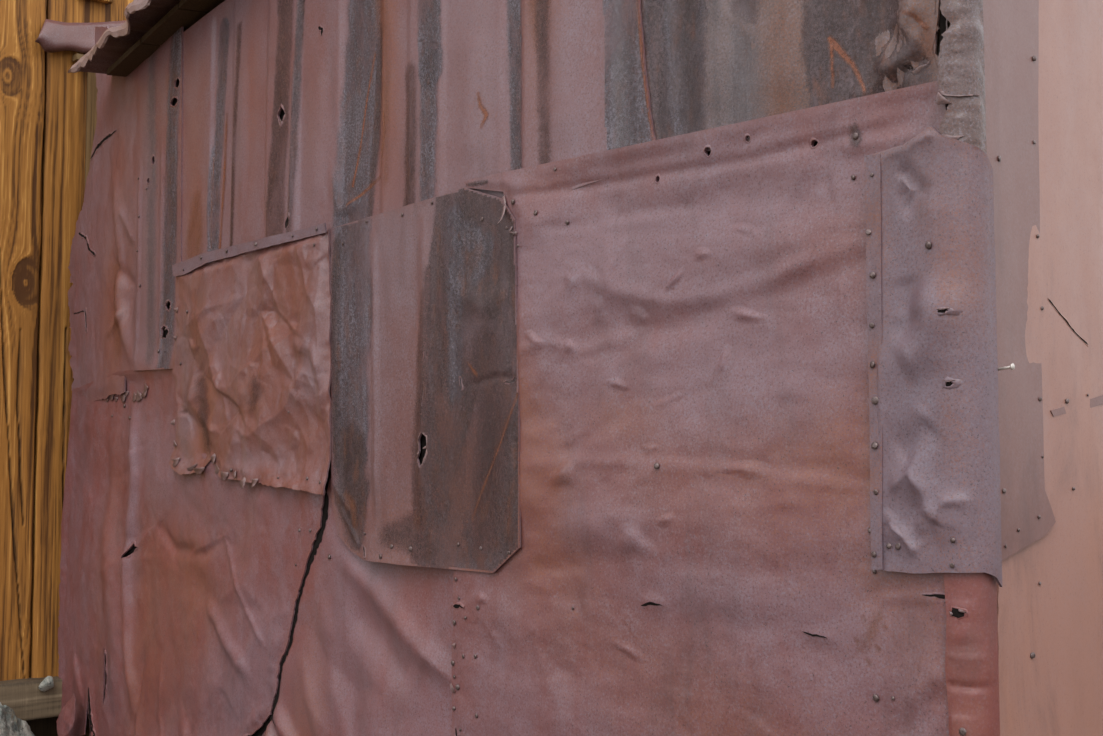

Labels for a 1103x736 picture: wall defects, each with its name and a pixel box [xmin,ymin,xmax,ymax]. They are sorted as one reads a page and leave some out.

rust [266,0,293,236]
rust [411,267,430,564]
crack [252,493,329,736]